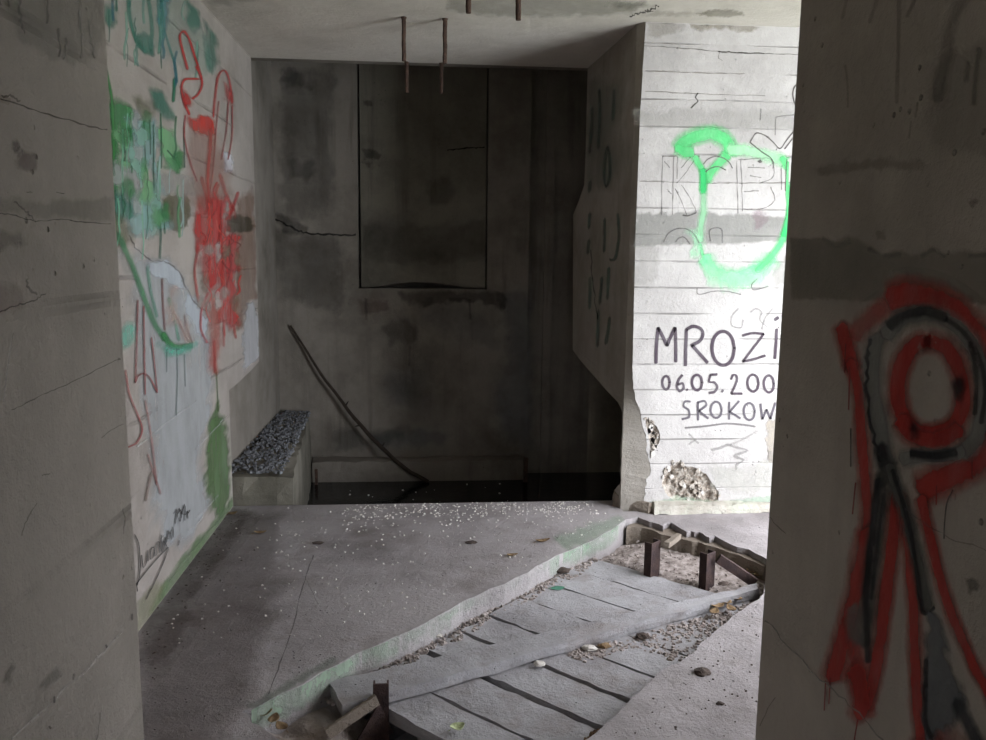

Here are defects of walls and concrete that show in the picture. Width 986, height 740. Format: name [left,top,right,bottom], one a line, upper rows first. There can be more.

crack [0,99,107,130]
crack [275,218,356,236]
spalling [644,417,660,458]
spalling [662,460,720,502]
crack [269,555,314,693]